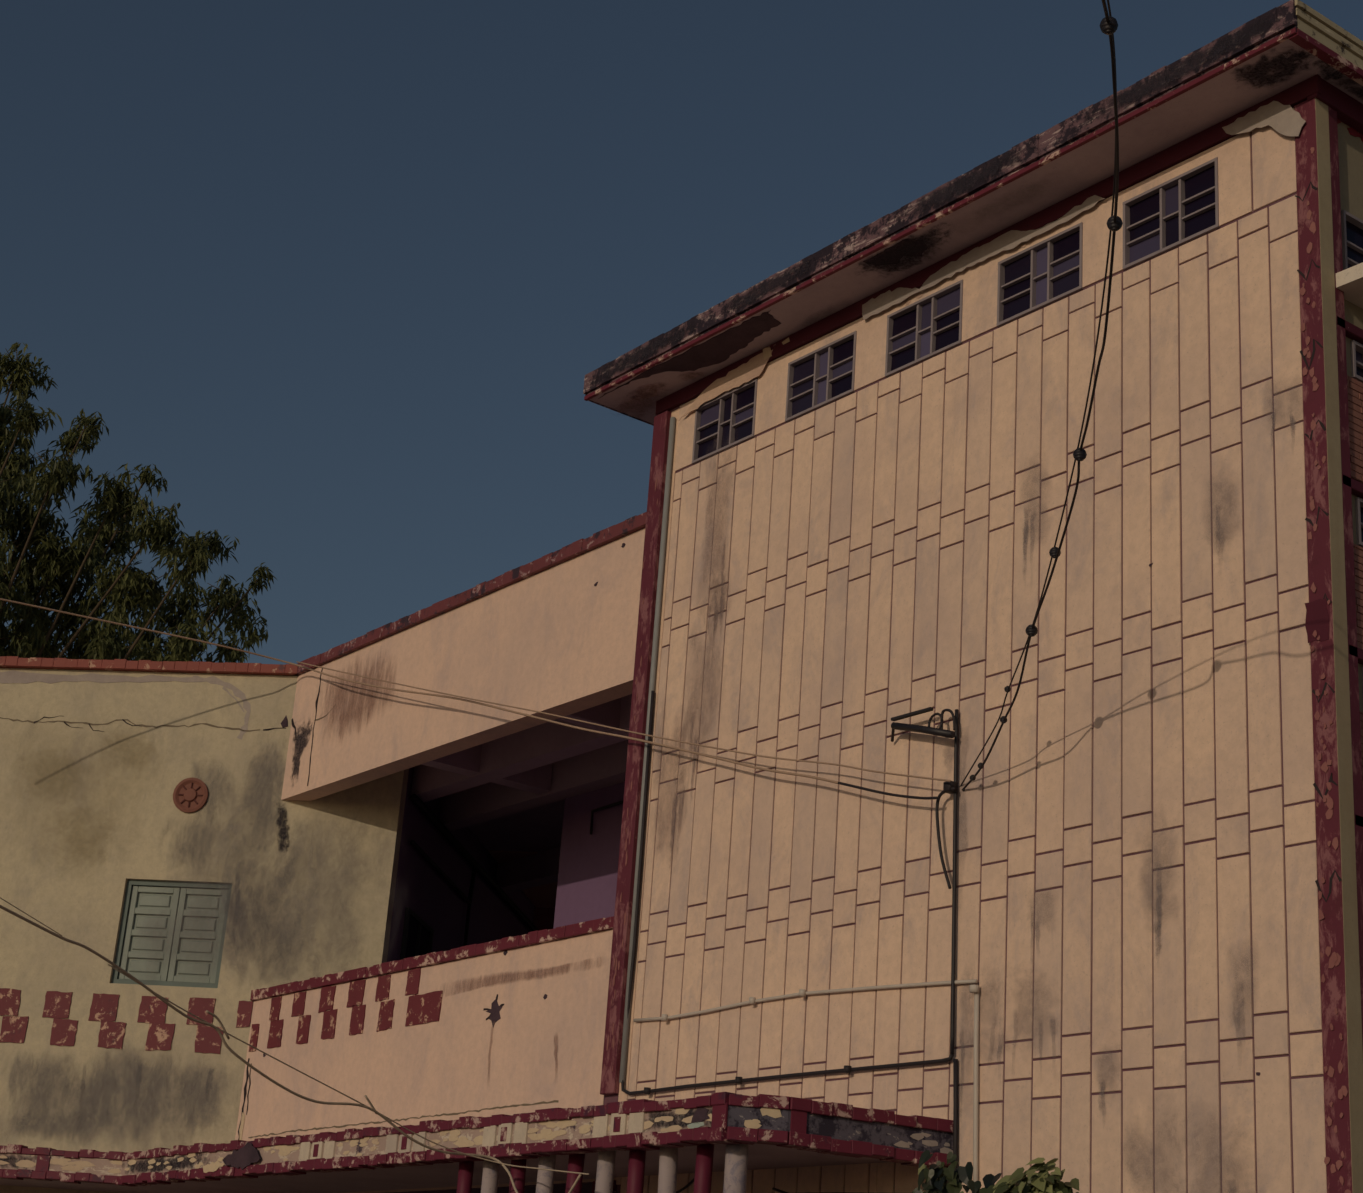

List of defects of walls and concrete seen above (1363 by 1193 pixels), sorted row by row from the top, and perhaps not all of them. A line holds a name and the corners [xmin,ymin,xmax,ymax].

damp [1086,20,1270,119]
damp [1236,50,1363,99]
peeling [1222,101,1306,137]
damp [898,151,1020,219]
peeling [861,195,1105,320]
peeling [1305,582,1330,653]
crack [0,668,334,786]
damp [292,722,311,777]
damp [276,808,289,851]
spalling [483,994,504,1027]
peeling [644,1107,712,1132]
spalling [0,1142,300,1174]